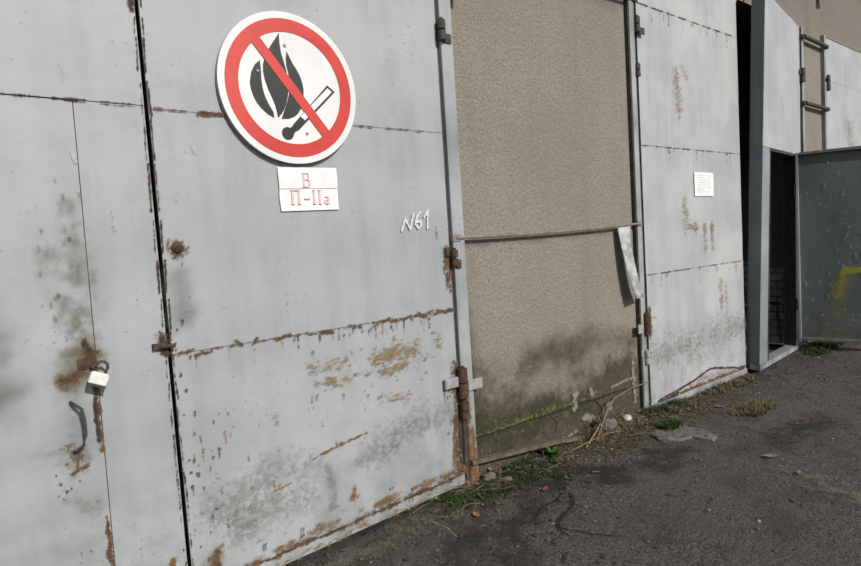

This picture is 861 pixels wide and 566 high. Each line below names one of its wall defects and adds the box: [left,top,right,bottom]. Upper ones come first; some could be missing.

corrosion [101,0,455,521]
corrosion [54,338,102,390]
water stain [521,337,589,372]
corrosion [93,386,105,452]
water stain [475,361,650,479]
corrosion [246,360,480,566]
corrosion [105,516,116,566]
corrosion [205,543,225,566]